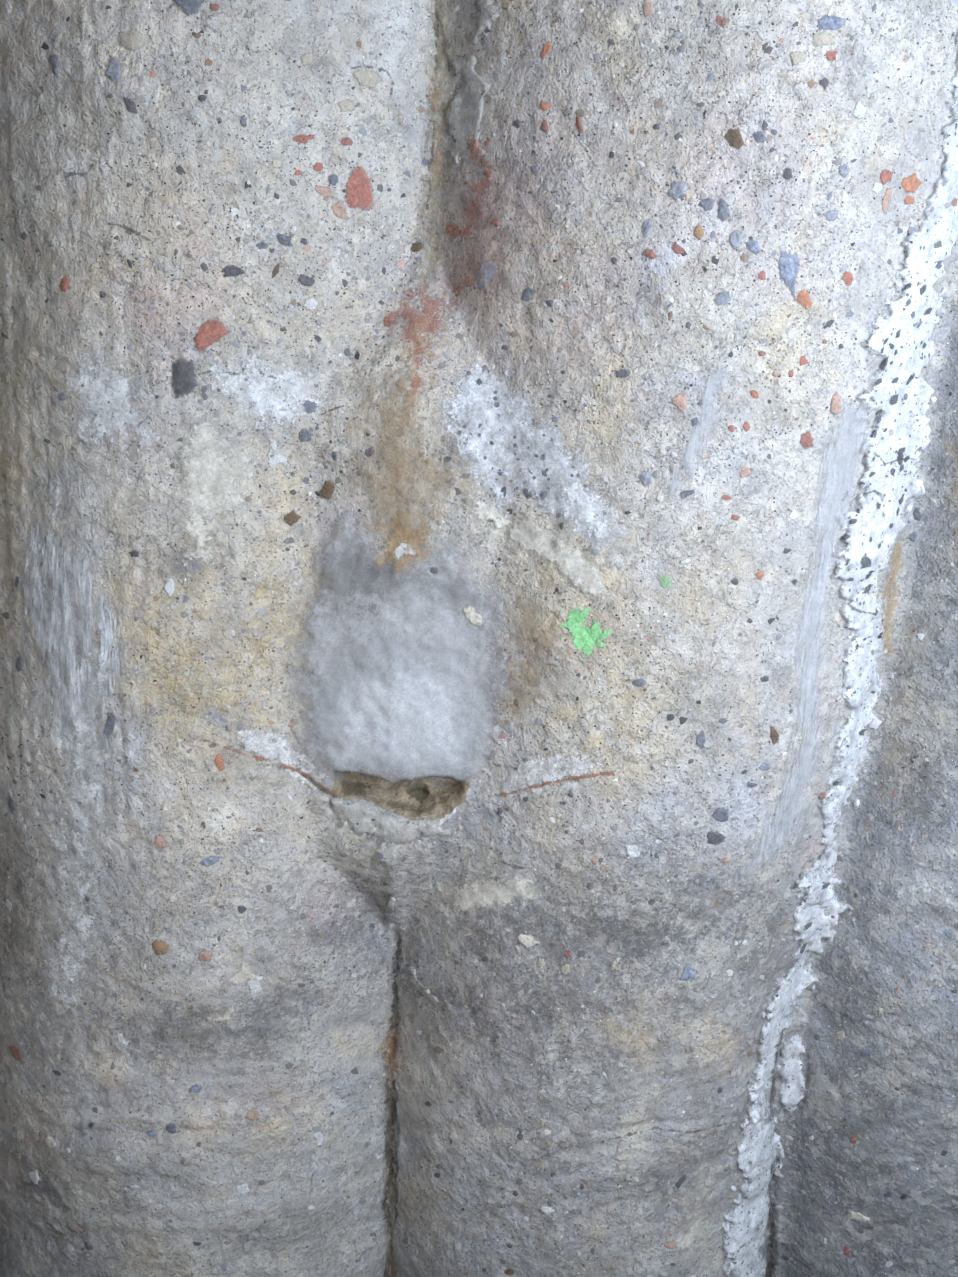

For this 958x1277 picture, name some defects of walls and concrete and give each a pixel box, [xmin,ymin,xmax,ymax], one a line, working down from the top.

crack [426,0,451,209]
corrosion [445,138,493,239]
corrosion [370,263,482,571]
water stain [880,543,904,656]
crack [203,720,339,798]
hole [329,761,470,826]
crack [498,750,616,805]
crack [382,937,401,1277]